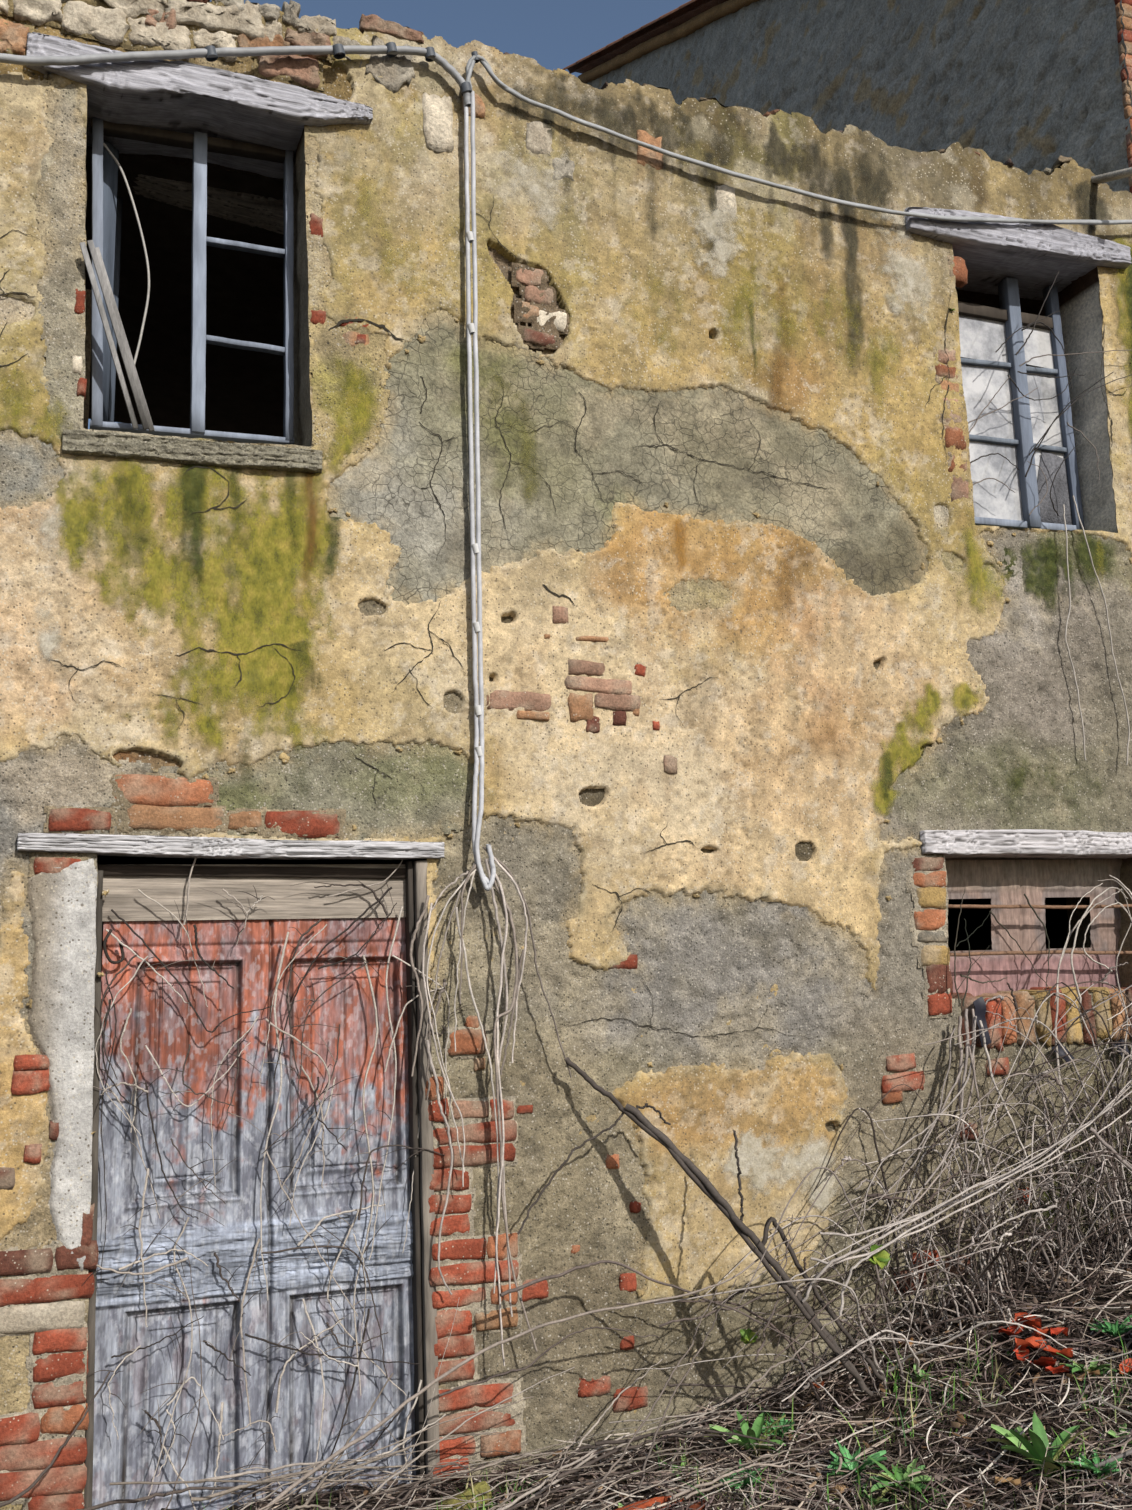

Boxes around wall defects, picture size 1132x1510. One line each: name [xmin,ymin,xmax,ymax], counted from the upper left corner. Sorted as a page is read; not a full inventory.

crack [329,319,404,340]
flaking render [0,0,963,616]
water stain [765,124,931,352]
flaking render [947,255,968,288]
water stain [1118,251,1132,369]
crack [495,383,836,541]
flaking render [934,348,972,528]
water stain [181,464,208,582]
water stain [327,517,339,574]
crack [543,584,574,604]
crack [384,601,466,706]
flaking render [0,528,1132,1510]